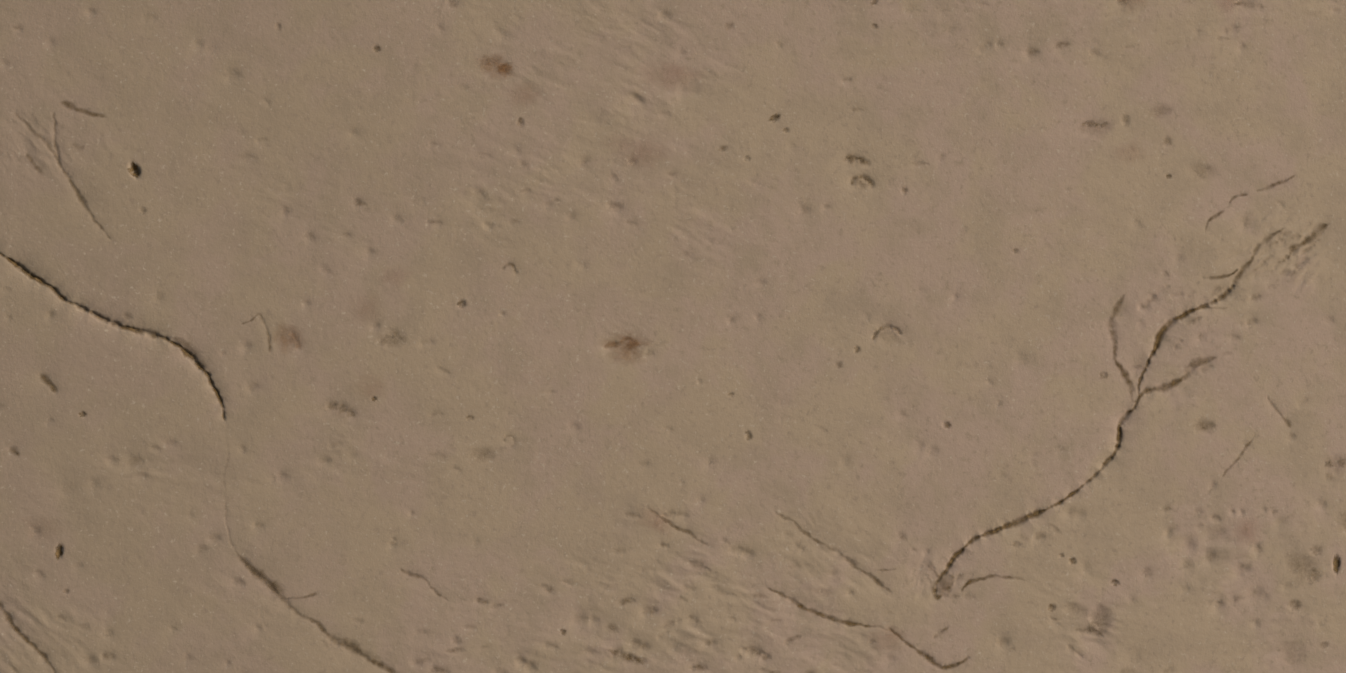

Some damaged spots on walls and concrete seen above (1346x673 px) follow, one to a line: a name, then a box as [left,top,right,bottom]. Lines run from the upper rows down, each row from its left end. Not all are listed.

crack [0,253,225,419]
crack [934,257,1253,599]
crack [7,616,46,658]